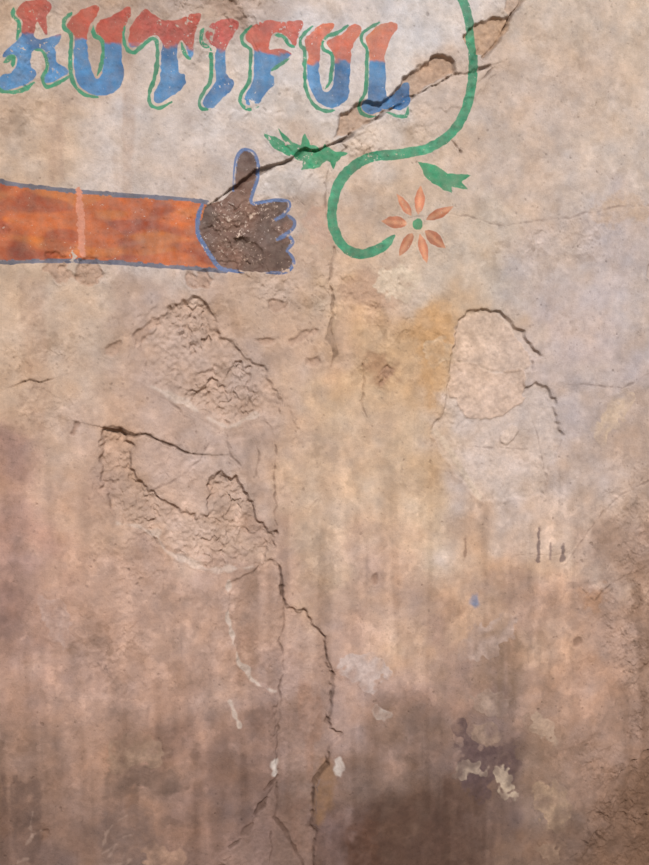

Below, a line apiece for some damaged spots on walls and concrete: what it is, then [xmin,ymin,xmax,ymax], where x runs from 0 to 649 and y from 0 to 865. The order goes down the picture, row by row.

crack [208,0,529,370]
crack [401,203,649,228]
crack [101,424,211,492]
crack [271,441,280,535]
crack [359,362,369,420]
spalling [429,306,567,505]
water stain [0,552,33,678]
spalling [94,272,399,865]
crack [277,565,341,865]
water stain [321,630,534,865]
water stain [0,761,55,865]
water stain [81,766,190,865]